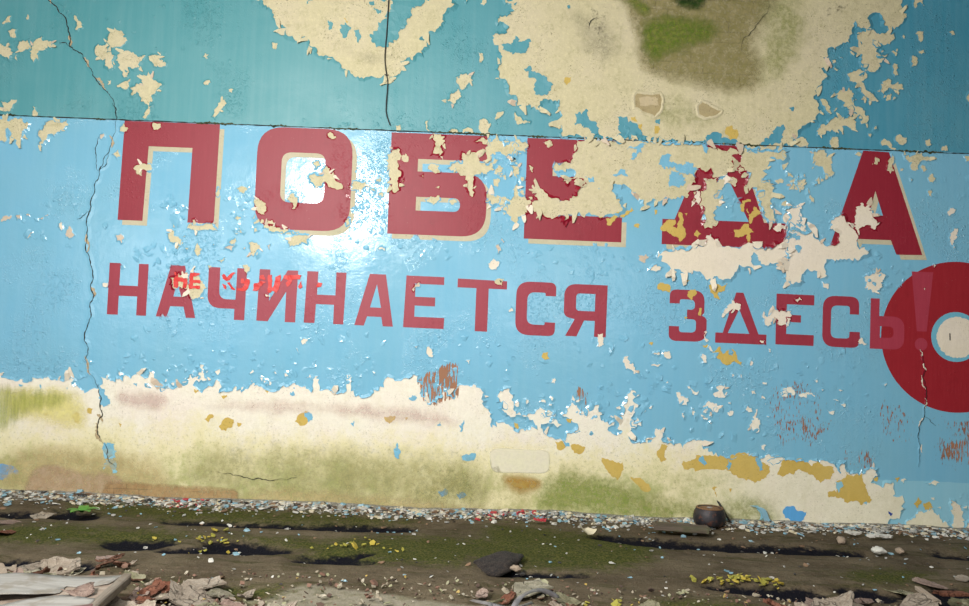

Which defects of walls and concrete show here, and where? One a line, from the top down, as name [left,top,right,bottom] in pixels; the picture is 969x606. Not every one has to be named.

peeling [93,27,168,131]
leakage [629,0,769,89]
peeling [0,99,71,151]
peeling [307,146,409,198]
peeling [419,0,949,353]
peeling [57,220,77,240]
peeling [166,185,312,301]
crack [0,0,969,473]
peeling [946,207,959,250]
rust [418,362,459,406]
peeling [0,329,969,581]
rust [934,421,969,471]